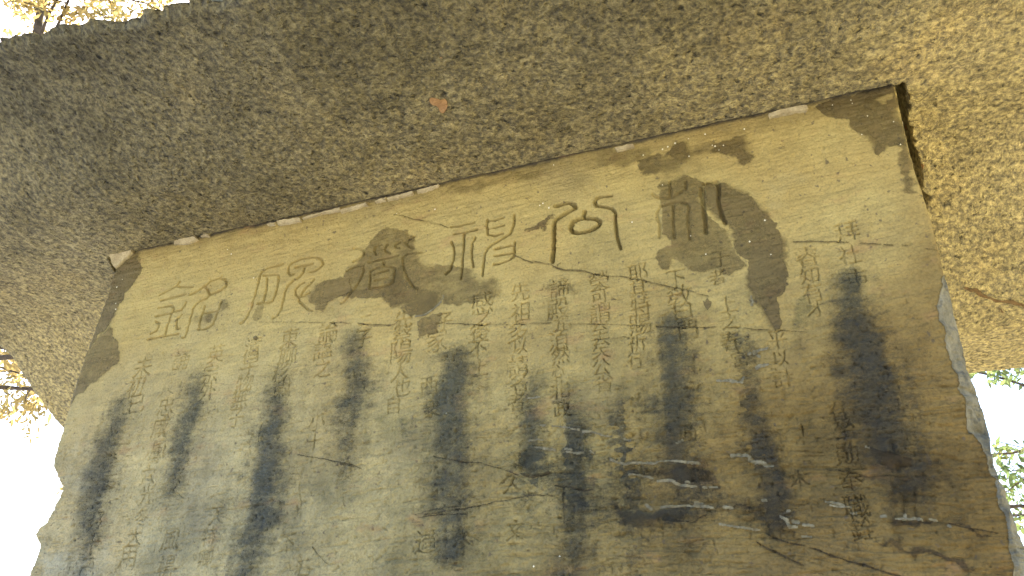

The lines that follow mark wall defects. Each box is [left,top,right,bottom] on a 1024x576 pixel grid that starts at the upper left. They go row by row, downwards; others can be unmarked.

water stain [815,84,915,193]
water stain [309,228,495,337]
crack [515,255,708,296]
water stain [638,136,788,329]
water stain [81,399,126,559]
water stain [168,377,201,489]
water stain [229,391,286,576]
water stain [424,347,474,561]
crack [415,456,593,523]
water stain [519,316,722,576]
water stain [831,269,930,496]
spalling [937,276,1024,576]